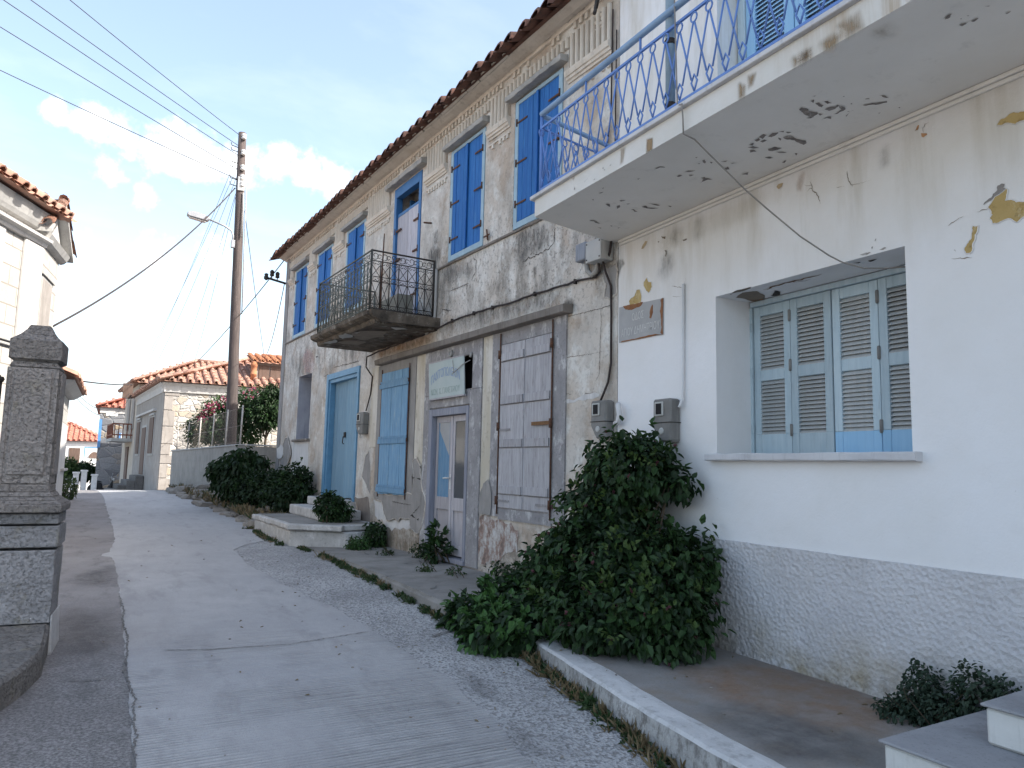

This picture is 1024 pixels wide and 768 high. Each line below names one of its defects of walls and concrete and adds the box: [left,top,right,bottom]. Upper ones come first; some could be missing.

peeling [799,95,900,119]
peeling [996,110,1024,126]
peeling [748,131,807,163]
peeling [964,184,1024,254]
peeling [629,277,652,305]
flaking render [354,450,426,534]
flaking render [478,514,519,565]